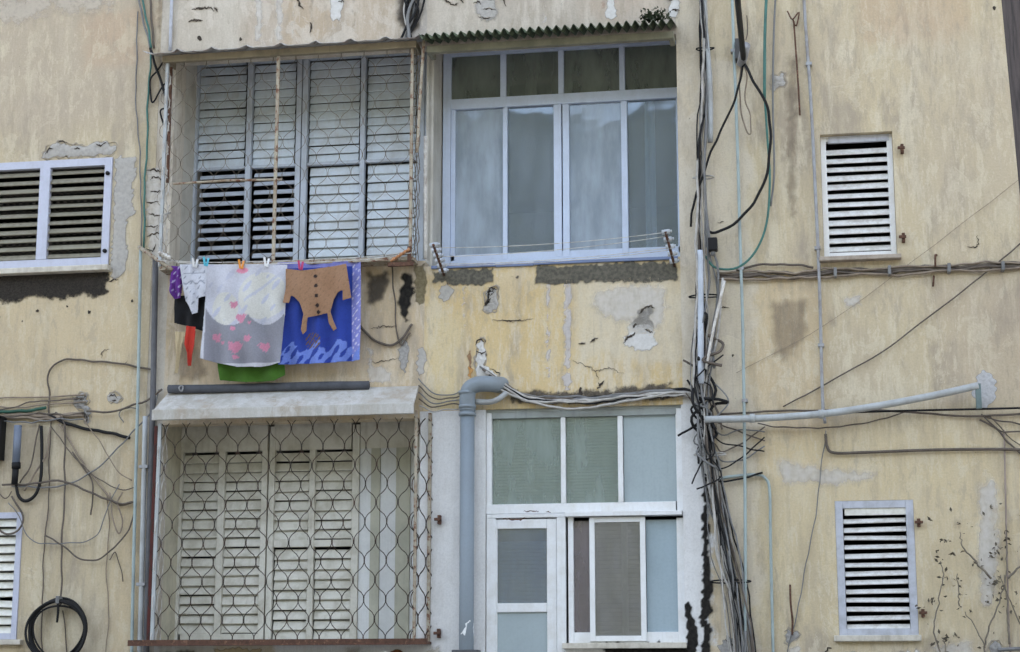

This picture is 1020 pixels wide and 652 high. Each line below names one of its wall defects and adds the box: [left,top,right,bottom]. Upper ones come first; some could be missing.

peeling [331,0,345,21]
peeling [476,0,497,21]
peeling [605,0,617,20]
peeling [669,0,680,17]
flaking render [41,140,118,161]
flaking render [482,284,500,314]
peeling [595,286,664,350]
flaking render [784,626,802,652]